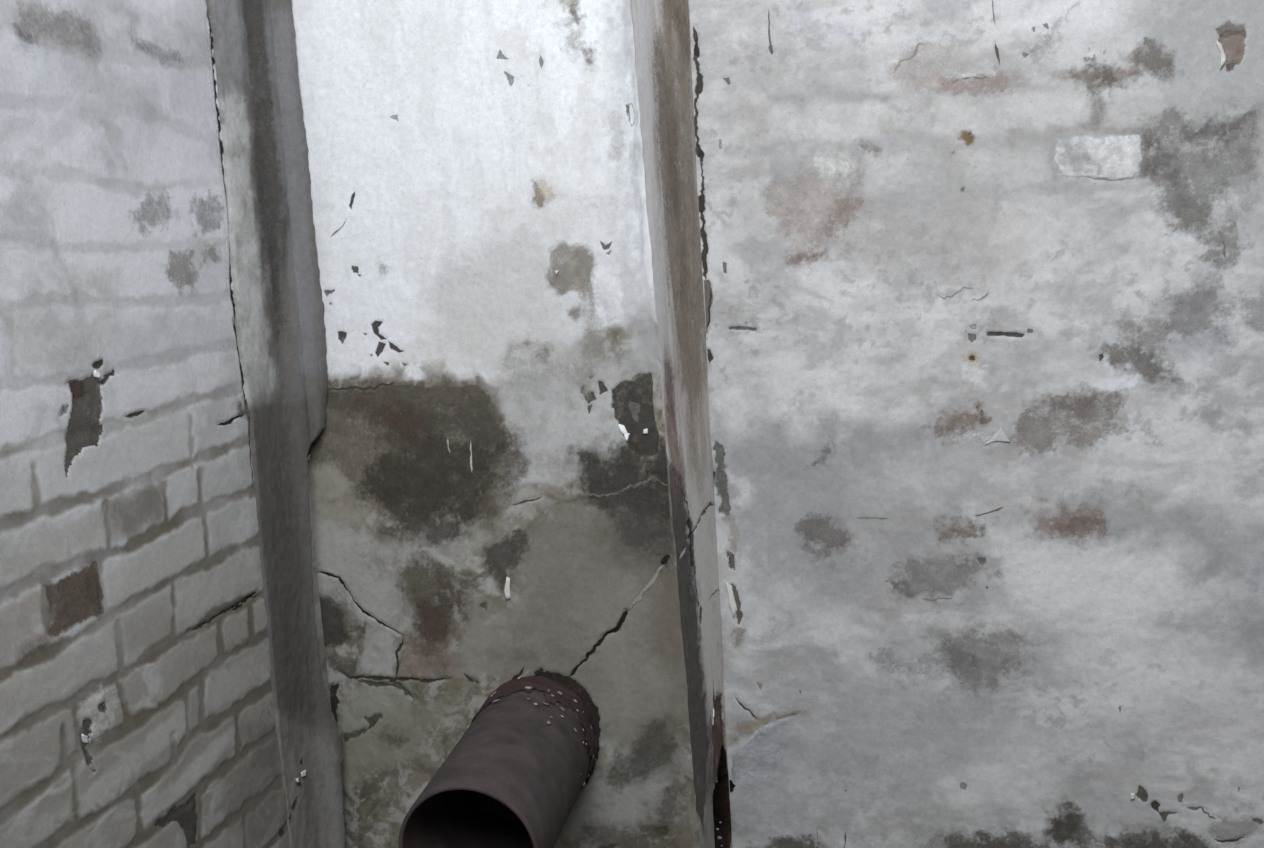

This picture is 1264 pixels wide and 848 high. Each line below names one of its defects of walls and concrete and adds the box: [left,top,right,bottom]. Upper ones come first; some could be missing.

crack [206,0,253,490]
damp [507,243,596,397]
damp [654,0,707,446]
crack [693,27,708,280]
peeling [1055,135,1142,181]
damp [1140,108,1258,268]
peeling [60,358,115,477]
flaking render [40,561,103,638]
crack [317,571,449,699]
crack [570,502,715,676]
flaking render [581,373,709,830]
damp [933,802,1208,848]